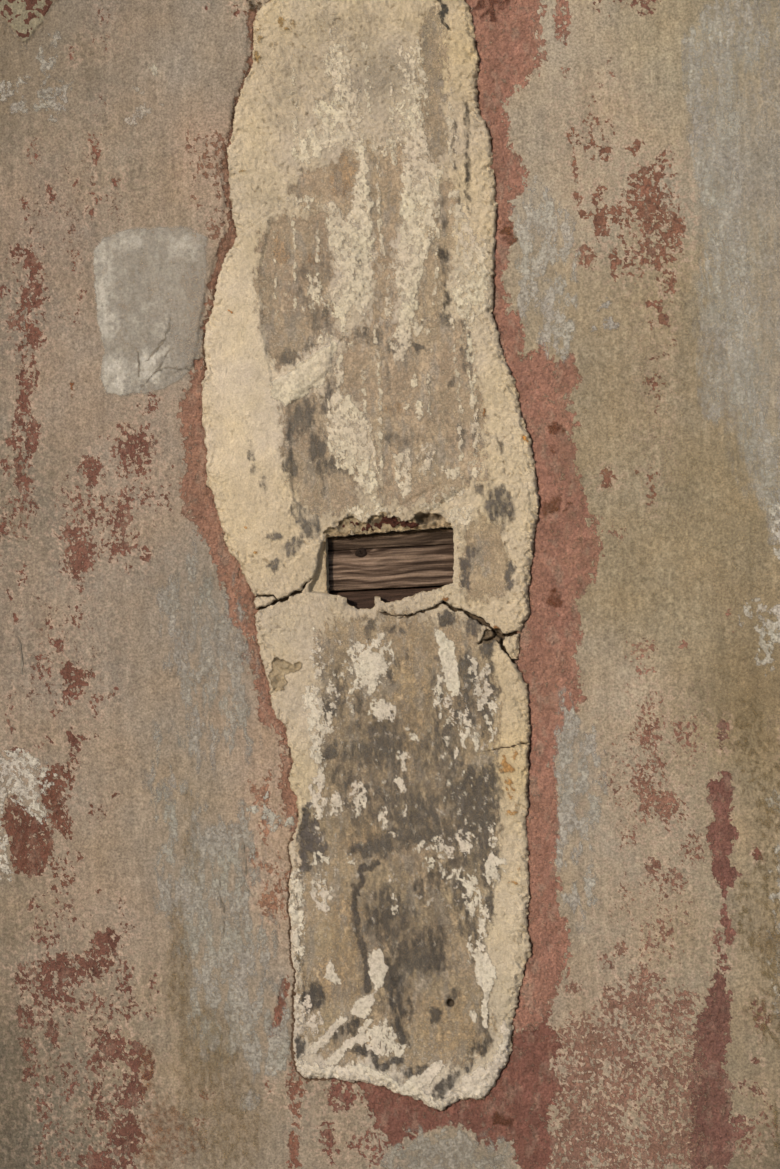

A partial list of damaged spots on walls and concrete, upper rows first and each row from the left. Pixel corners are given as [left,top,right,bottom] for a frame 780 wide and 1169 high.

peeling [233,1,257,111]
peeling [186,129,237,342]
leakage [682,0,780,560]
crack [380,601,517,664]
peeling [317,0,777,1169]
leakage [738,598,780,676]
peeling [269,975,290,1038]
peeling [286,1062,308,1169]